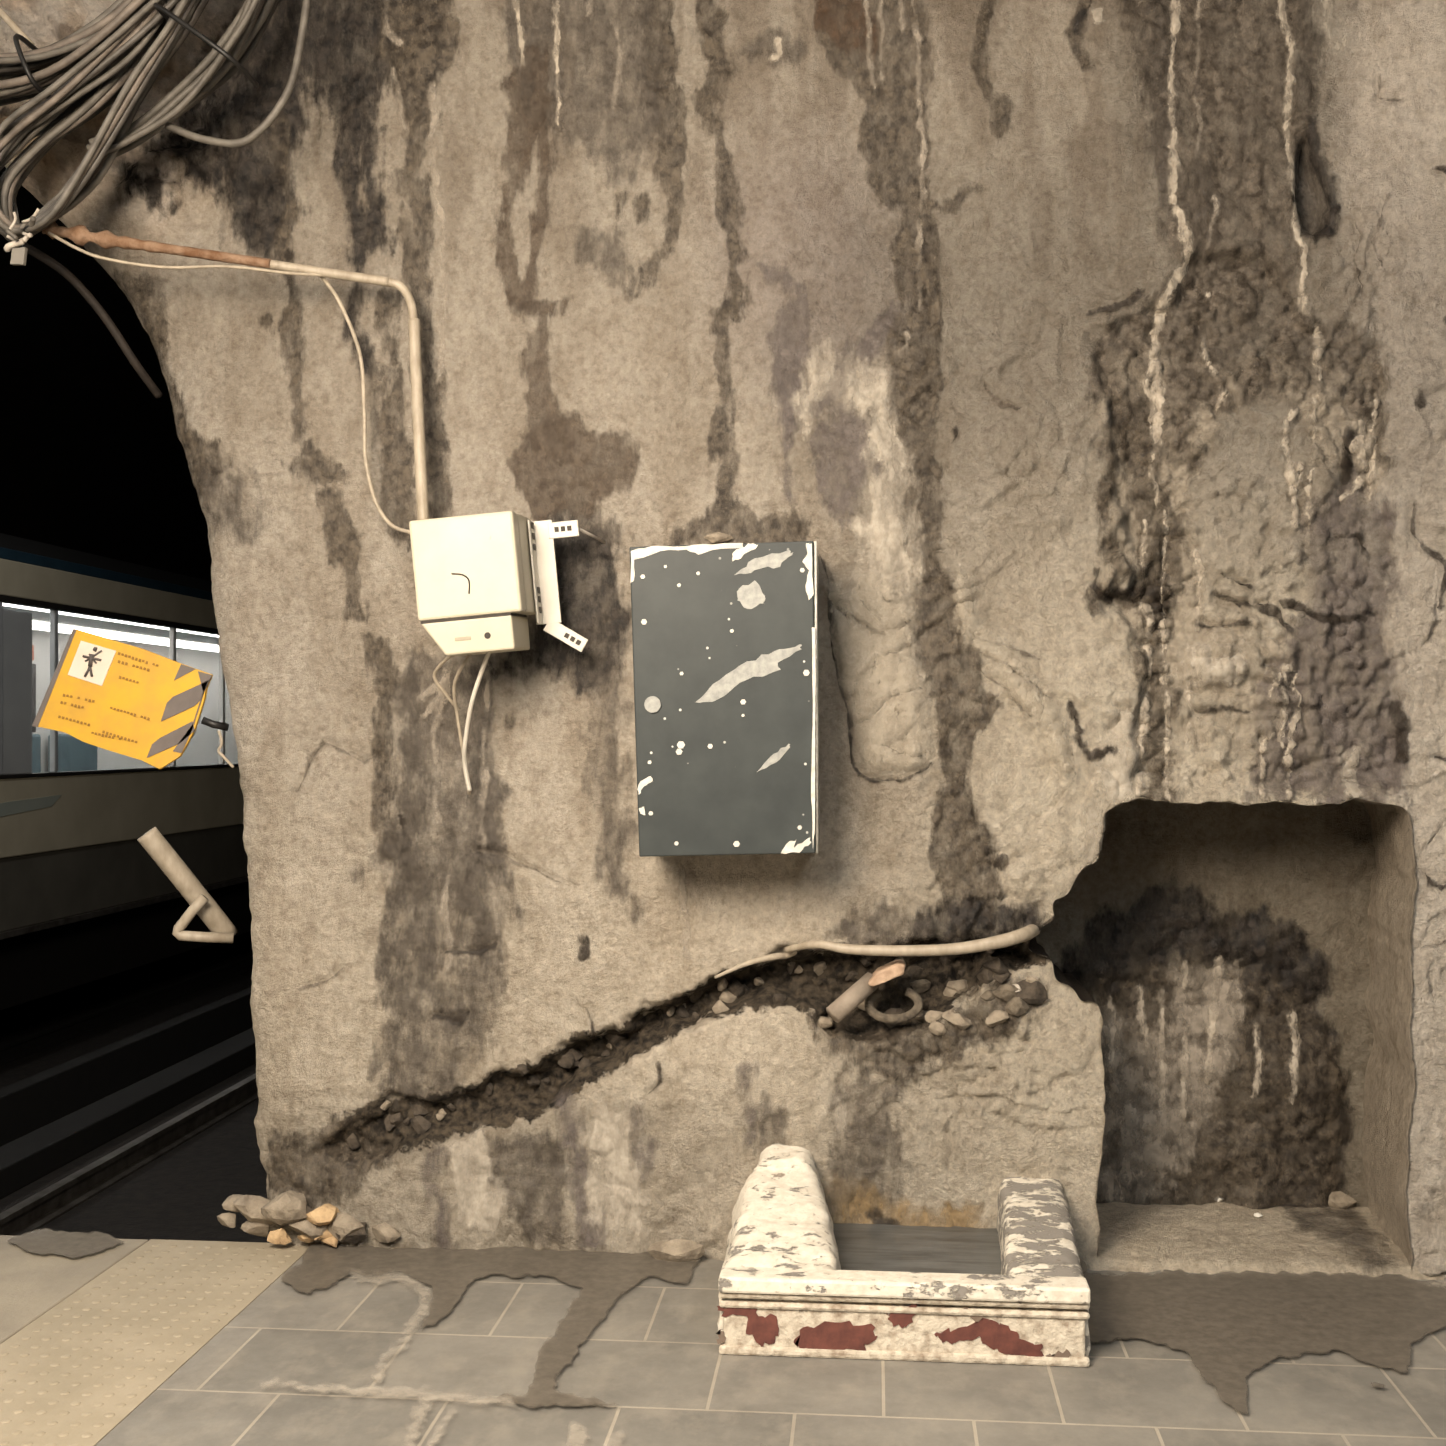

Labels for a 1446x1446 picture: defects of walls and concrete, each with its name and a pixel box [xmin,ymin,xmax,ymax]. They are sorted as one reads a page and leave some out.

leakage [114,0,810,1106]
leakage [763,0,1041,962]
leakage [1085,0,1407,860]
crack [432,1011,470,1026]
crack [445,942,497,955]
leakage [267,1094,700,1408]
crack [649,1062,662,1093]
leakage [1062,879,1446,1413]